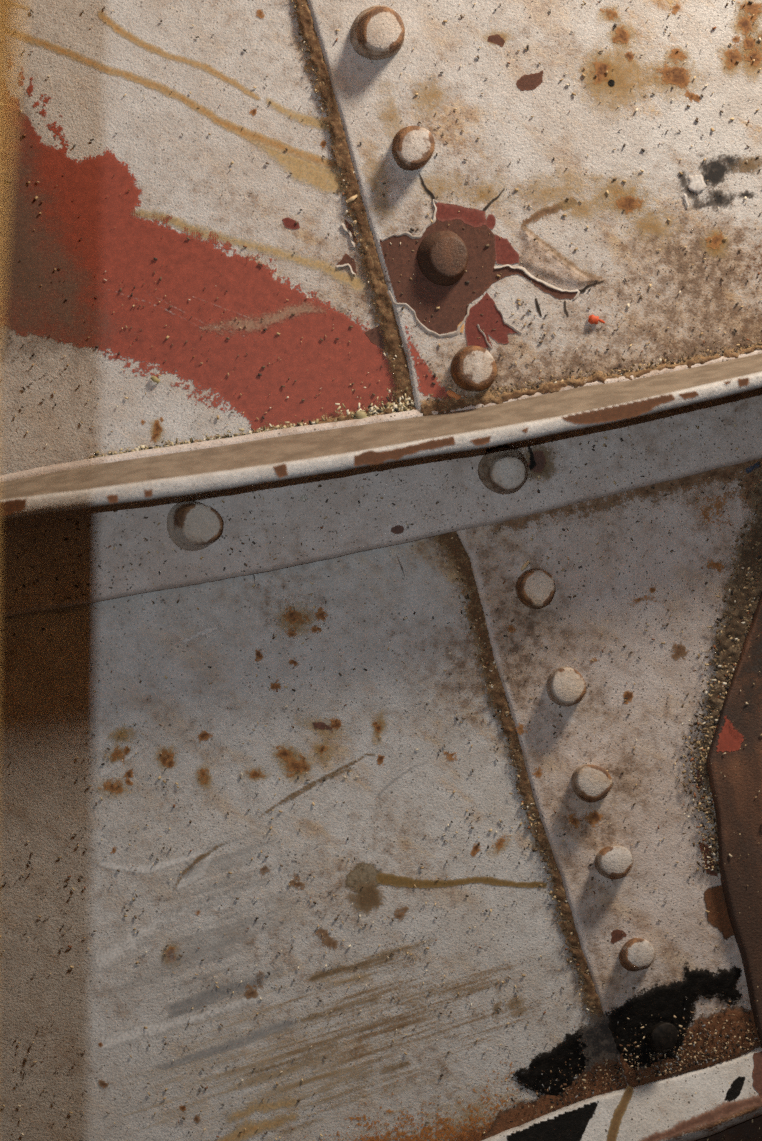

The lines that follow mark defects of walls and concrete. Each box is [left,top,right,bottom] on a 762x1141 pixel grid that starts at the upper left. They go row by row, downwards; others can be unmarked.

corrosion [600,8,634,61]
corrosion [653,48,700,102]
spalling [273,464,288,478]
spalling [354,436,455,466]
spalling [470,436,509,452]
peeling [522,427,554,479]
spalling [0,498,27,516]
corrosion [671,644,687,660]
corrosion [99,728,134,794]
corrosion [275,718,342,780]
corrosion [372,713,386,766]
corrosion [304,1005,762,1141]